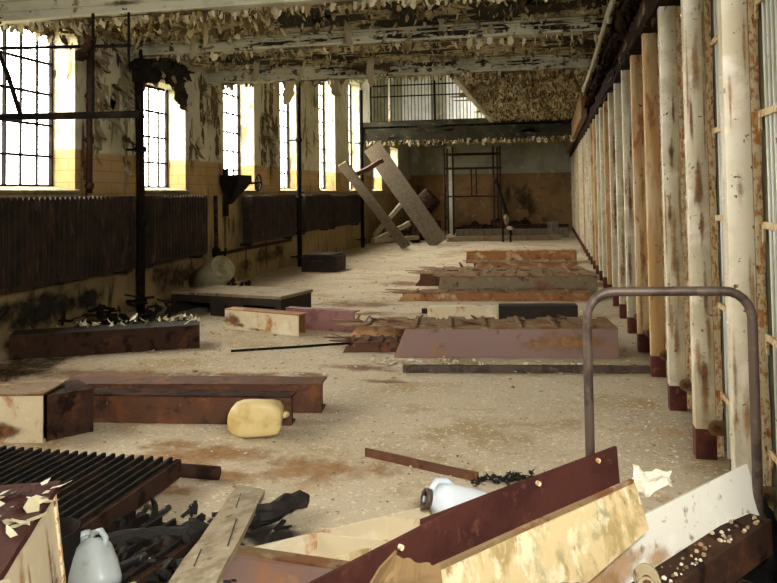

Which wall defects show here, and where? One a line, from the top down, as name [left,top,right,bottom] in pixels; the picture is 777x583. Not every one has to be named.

peeling [0,0,619,187]